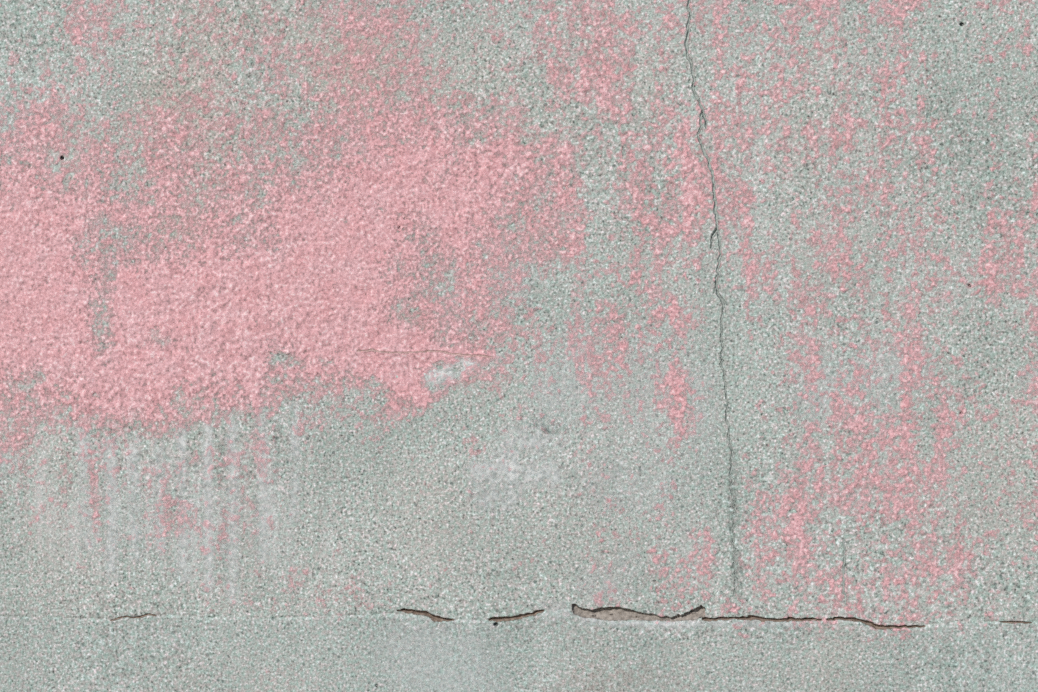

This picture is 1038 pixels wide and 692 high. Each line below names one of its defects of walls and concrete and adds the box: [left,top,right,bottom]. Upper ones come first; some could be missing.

crack [684,0,925,630]
crack [110,613,156,621]
crack [397,609,454,622]
crack [489,610,544,622]
crack [1000,618,1032,626]